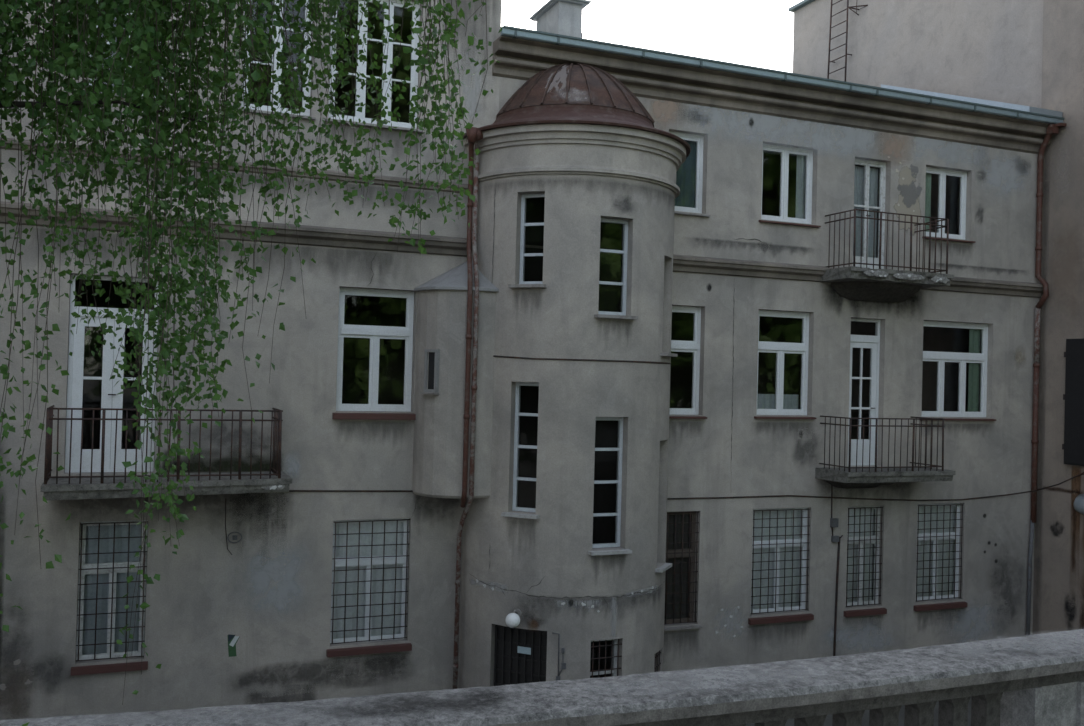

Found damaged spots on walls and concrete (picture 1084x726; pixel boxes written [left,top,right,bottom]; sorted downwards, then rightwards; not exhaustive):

flaking render [894,167,921,235]
spalling [864,270,950,284]
corrosion [1047,468,1084,567]